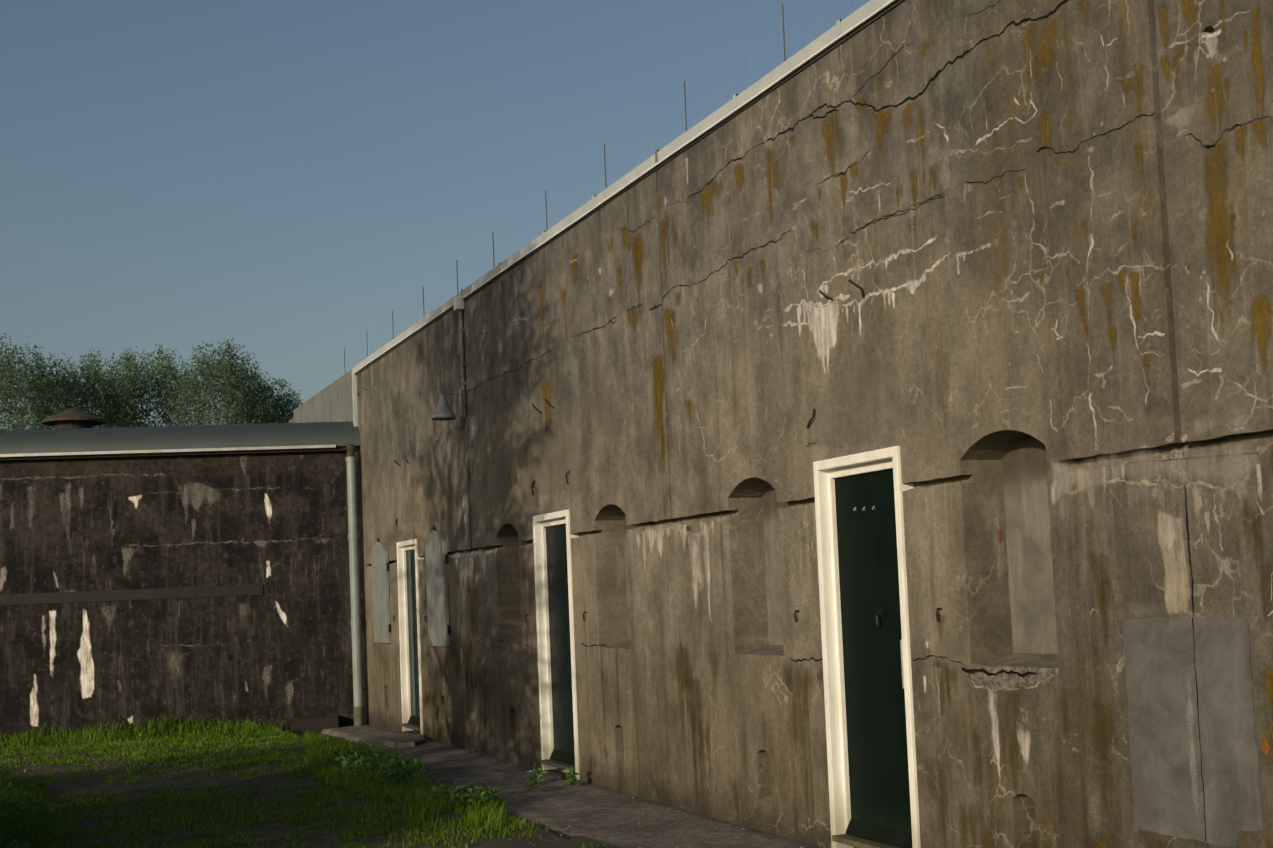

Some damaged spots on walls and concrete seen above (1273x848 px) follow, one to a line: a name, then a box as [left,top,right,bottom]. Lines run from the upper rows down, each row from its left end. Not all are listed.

crack [621,0,1068,232]
crack [1185,116,1273,149]
crack [458,112,1155,392]
water stain [783,237,991,374]
crack [1184,488,1194,612]
peeling [30,676,38,726]
peeling [42,611,56,670]
peeling [78,611,94,698]
spalling [961,665,1058,692]